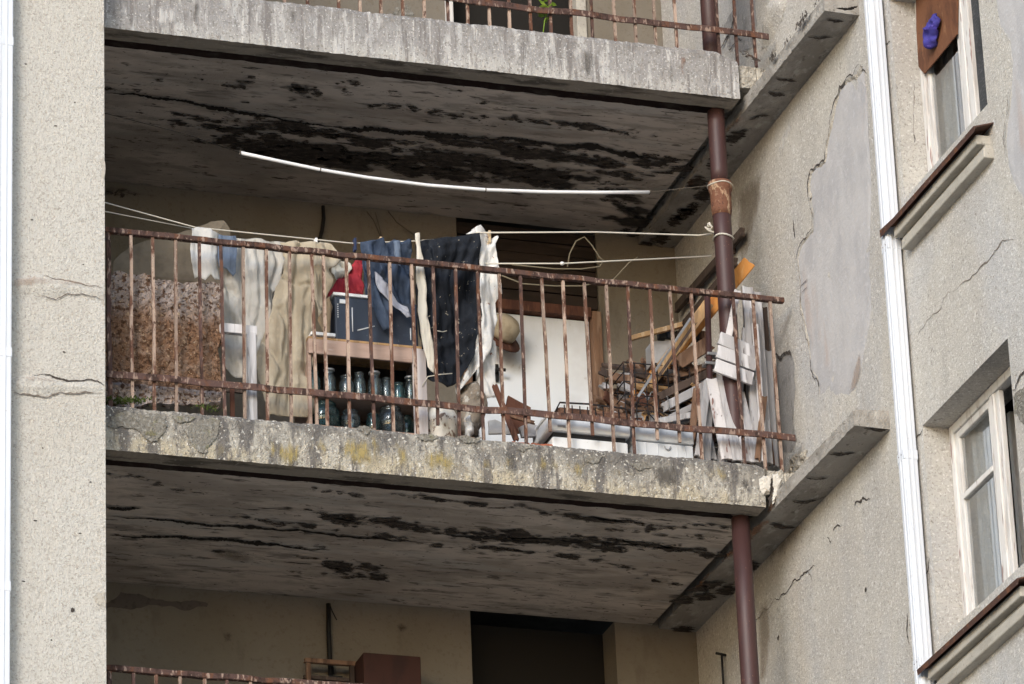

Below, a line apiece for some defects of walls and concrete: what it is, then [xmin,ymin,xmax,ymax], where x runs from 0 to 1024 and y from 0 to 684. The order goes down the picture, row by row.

crack [793,64,865,393]
crack [915,237,1016,342]
water stain [657,467,675,483]
peeling [759,350,808,507]
crack [757,565,814,619]